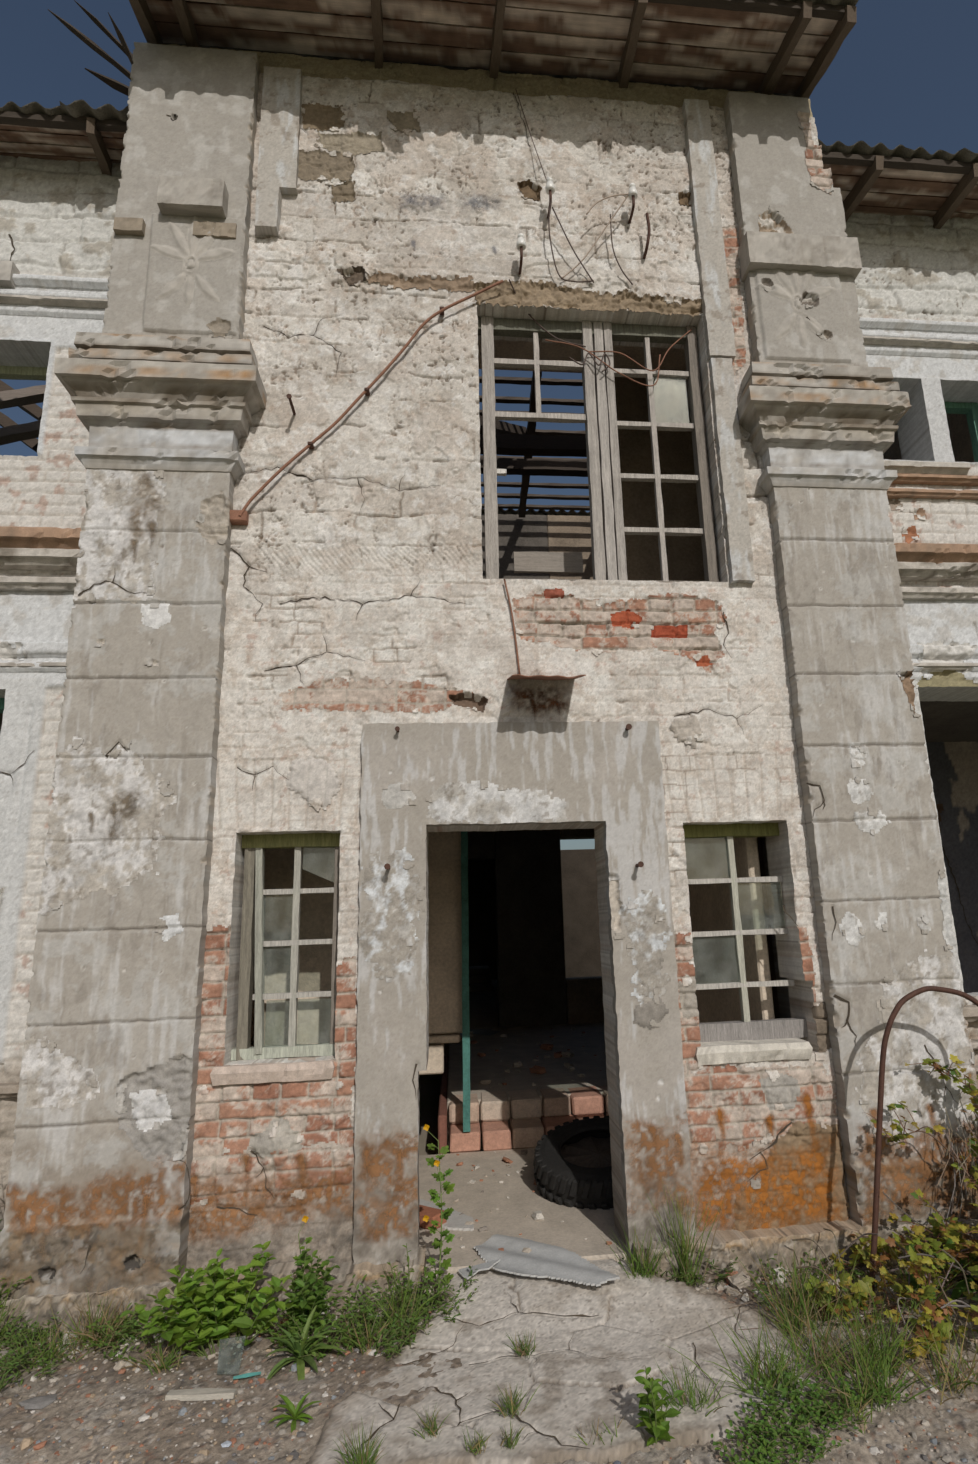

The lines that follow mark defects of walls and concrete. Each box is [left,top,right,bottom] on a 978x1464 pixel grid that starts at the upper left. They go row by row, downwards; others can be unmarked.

peeling [298,103,421,203]
spalling [797,111,834,195]
crack [231,548,472,621]
crack [264,636,365,681]
rust [515,689,566,712]
spalling [512,588,727,673]
peeling [847,742,892,836]
spalling [935,797,944,833]
spalling [19,847,426,1205]
crack [361,1303,649,1449]